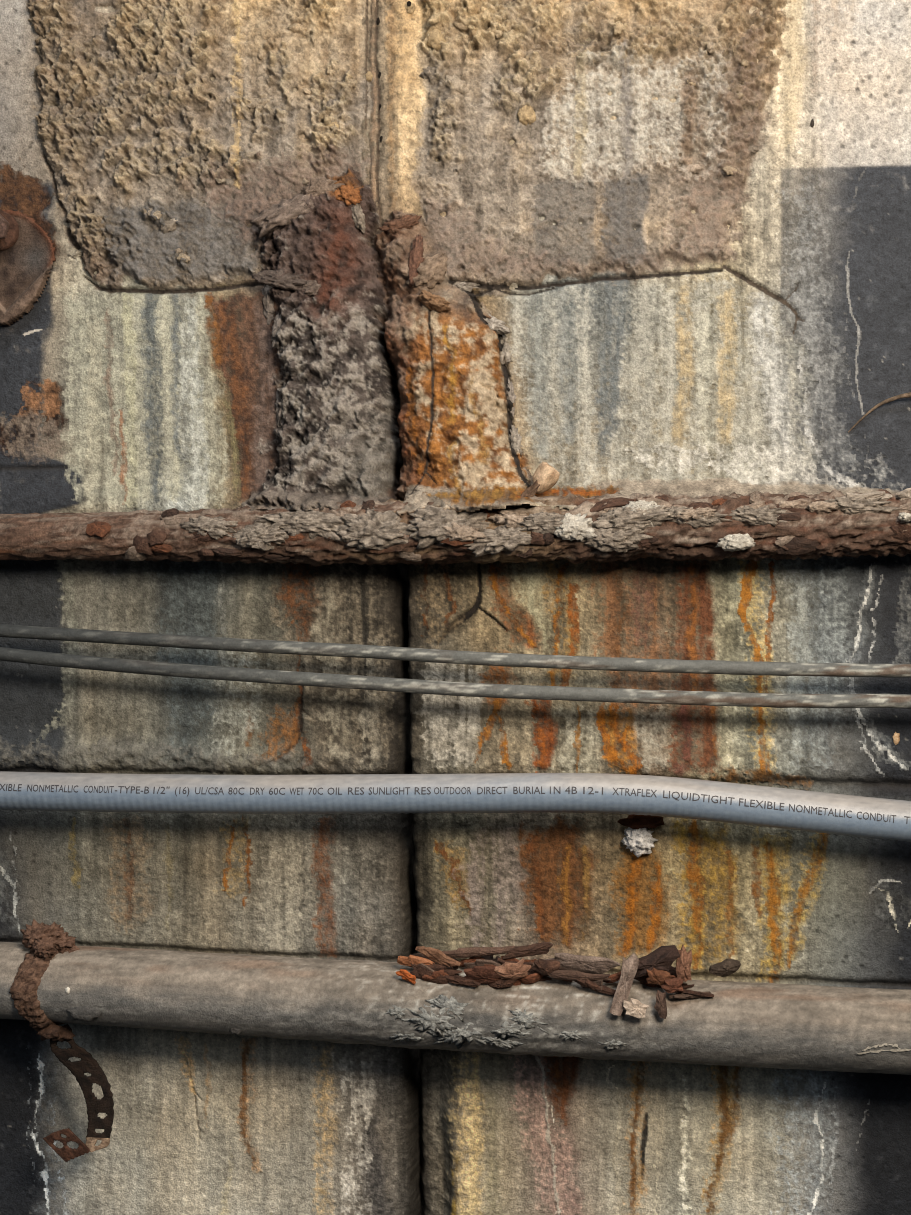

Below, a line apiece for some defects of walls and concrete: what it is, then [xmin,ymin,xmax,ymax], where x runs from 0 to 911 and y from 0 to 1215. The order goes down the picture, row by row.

rust [0,156,68,259]
flaking render [23,0,373,296]
crack [364,0,383,234]
flaking render [408,0,794,298]
rust [0,378,69,468]
damp [58,281,233,511]
rust [203,289,277,504]
crack [464,563,506,629]
rust [421,483,625,509]
rust [473,556,814,791]
rust [517,812,831,1019]
rust [699,1065,744,1215]